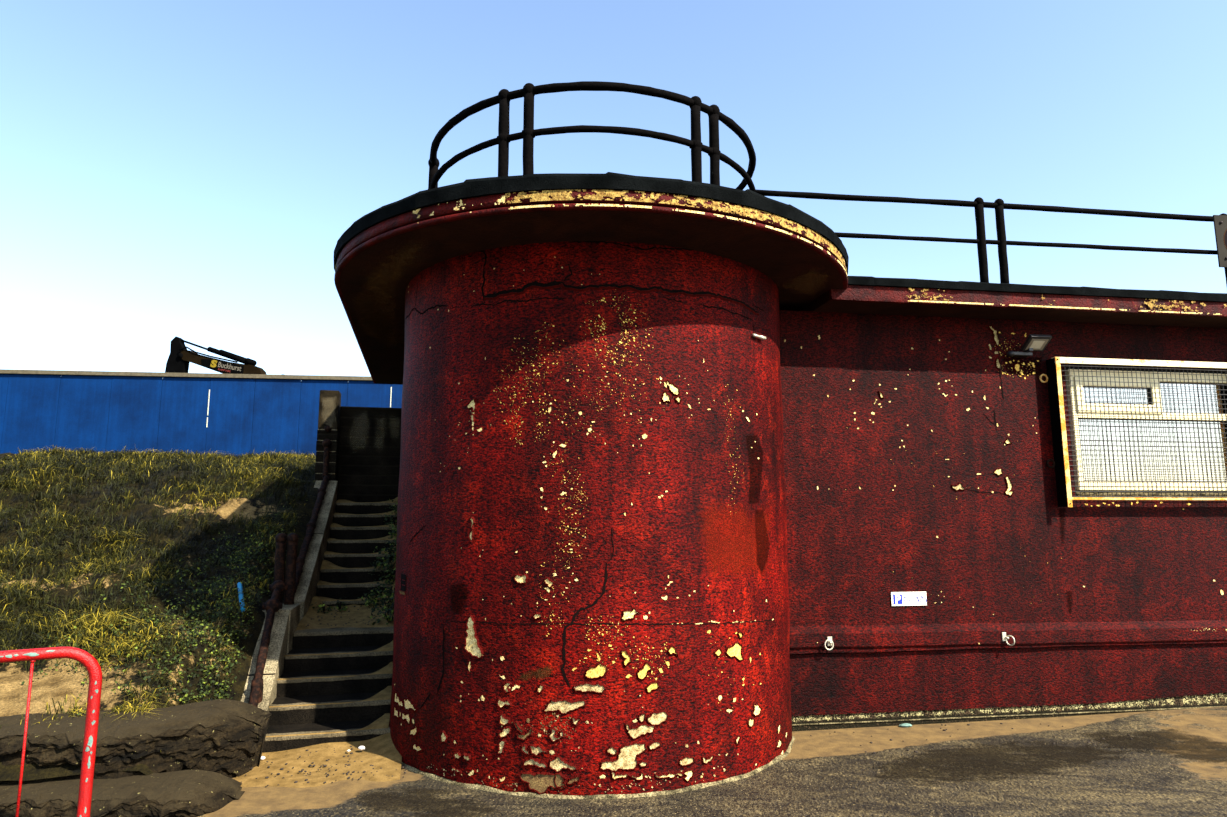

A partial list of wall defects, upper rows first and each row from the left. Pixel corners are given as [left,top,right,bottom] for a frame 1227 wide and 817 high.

peeling [413,189,848,276]
crack [404,241,764,332]
peeling [906,288,994,305]
peeling [1009,294,1227,315]
peeling [985,325,1039,389]
peeling [459,295,711,636]
peeling [944,467,1014,499]
crack [420,529,775,709]
peeling [393,684,423,753]
peeling [427,592,762,794]